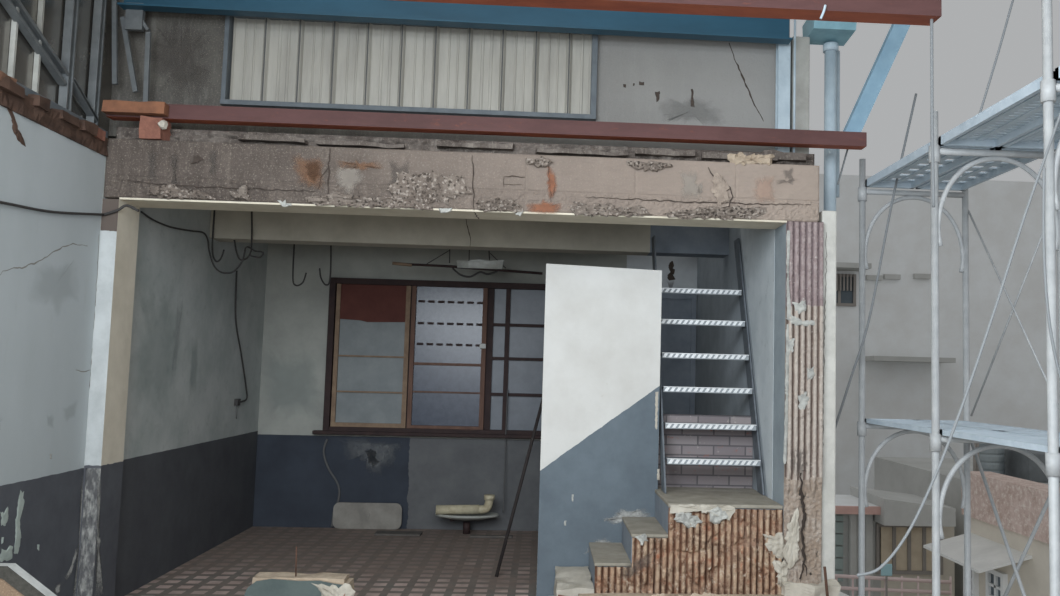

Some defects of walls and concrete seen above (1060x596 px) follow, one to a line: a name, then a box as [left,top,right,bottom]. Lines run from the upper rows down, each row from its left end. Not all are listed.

crack [729,43,764,121]
spalling [170,129,815,220]
rust [531,171,557,213]
crack [0,236,99,320]
spalling [783,230,815,464]
crack [821,232,829,445]
peeling [350,440,393,471]
peeling [0,490,25,562]
spalling [594,504,800,596]
crack [799,473,807,579]